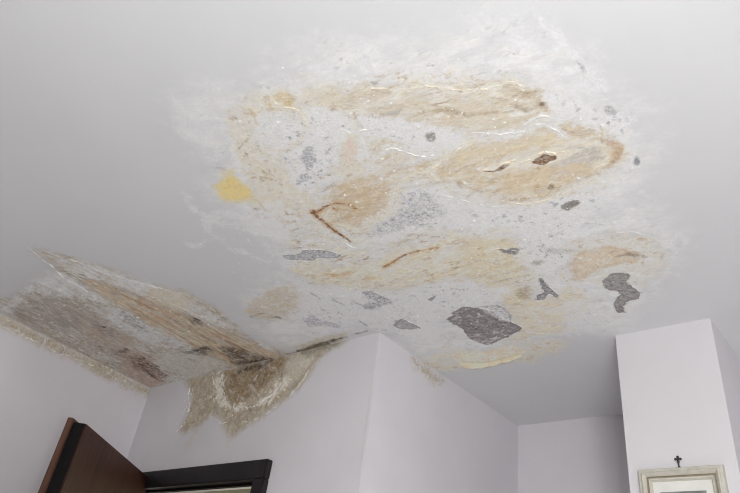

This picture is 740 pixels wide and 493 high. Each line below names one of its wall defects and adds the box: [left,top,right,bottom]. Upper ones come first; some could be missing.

spalling [282,249,342,262]
spalling [355,290,394,310]
spalling [535,278,559,301]
spalling [602,272,642,314]
spalling [393,318,421,330]
spalling [446,305,525,370]